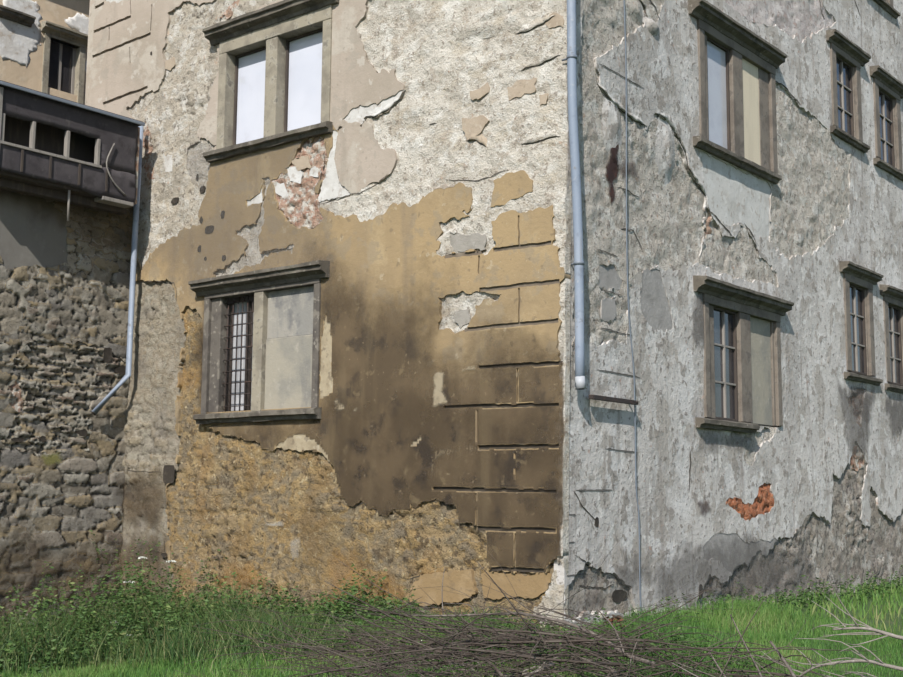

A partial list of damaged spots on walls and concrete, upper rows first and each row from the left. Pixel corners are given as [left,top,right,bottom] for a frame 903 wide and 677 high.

flaking render [0,0,634,630]
leakage [234,273,564,573]
crack [595,76,759,252]
flaking render [577,0,852,347]
flaking render [744,427,776,466]
flaking render [696,442,903,612]